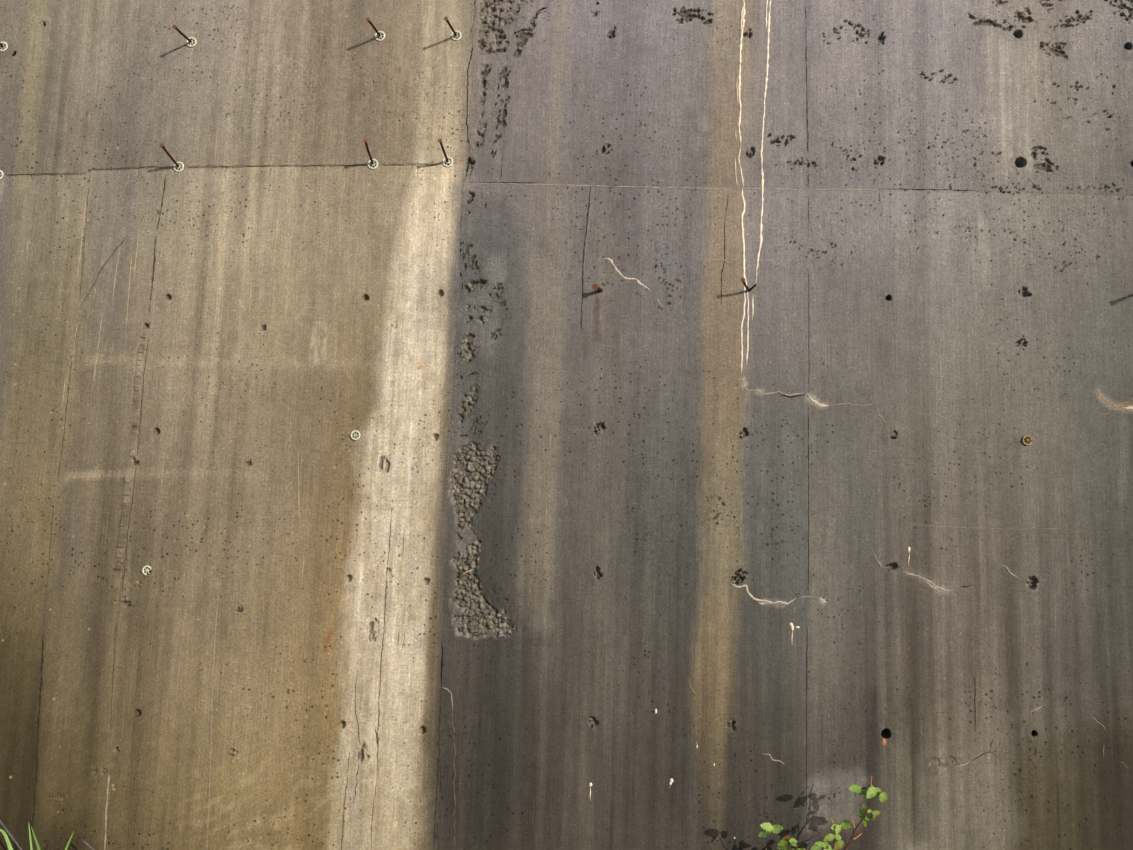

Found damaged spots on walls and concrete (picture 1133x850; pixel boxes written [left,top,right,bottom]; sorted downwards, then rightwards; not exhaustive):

spalling [444,0,613,451]
crack [604,242,660,304]
spalling [633,217,708,336]
water stain [687,0,768,478]
spalling [754,120,832,182]
spalling [798,0,1133,293]
water stain [511,215,625,719]
crack [742,377,889,430]
crack [733,584,826,605]
crack [874,554,974,592]
water stain [682,543,789,850]
water stain [989,684,1133,850]